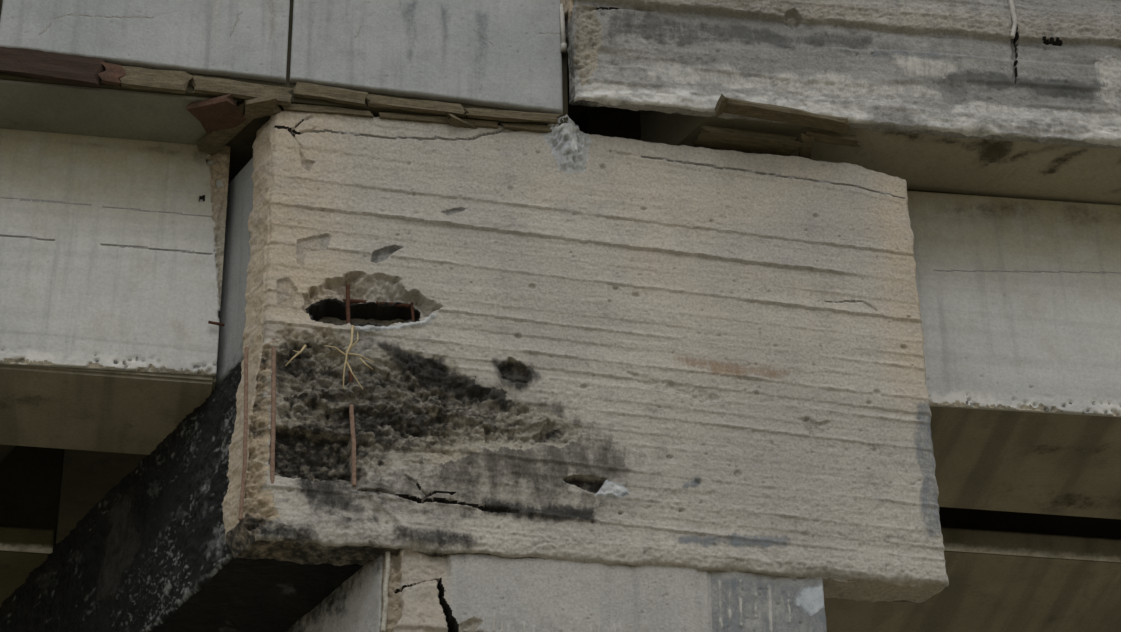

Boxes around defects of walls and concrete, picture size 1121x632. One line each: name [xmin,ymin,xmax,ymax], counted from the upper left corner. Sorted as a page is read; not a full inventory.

crack [1008,0,1063,82]
crack [274,119,506,141]
spalling [296,233,332,267]
spalling [370,244,404,264]
spalling [276,276,298,308]
spalling [238,323,585,535]
crack [395,483,489,511]
spalling [563,474,609,494]
crack [395,578,480,632]